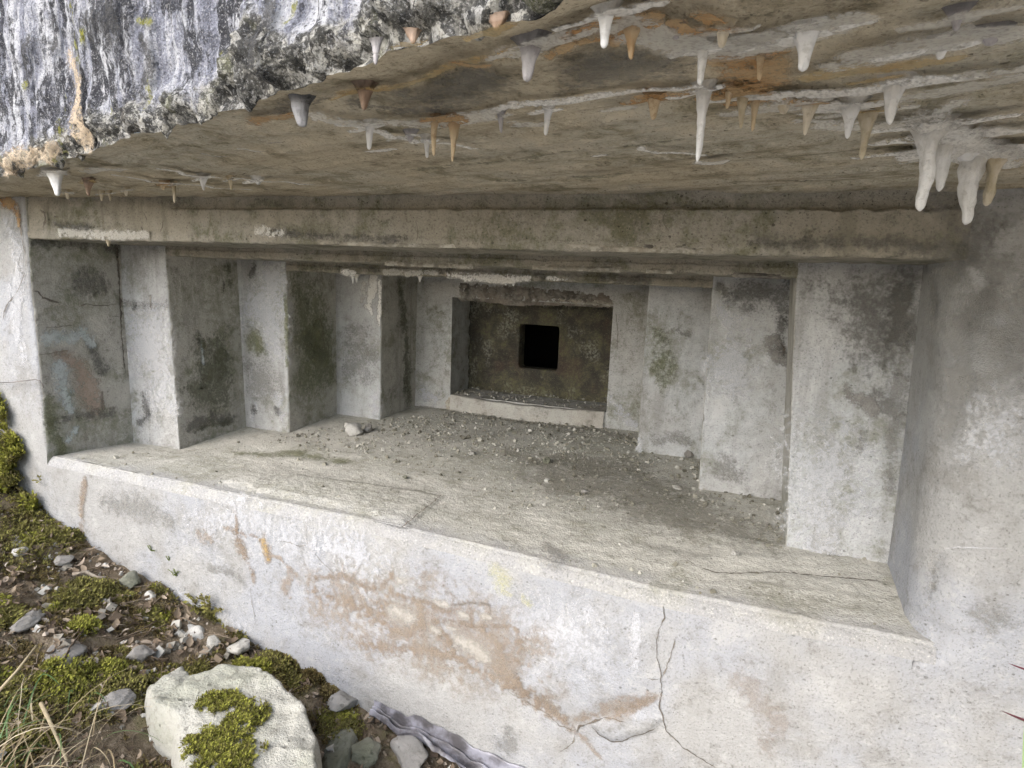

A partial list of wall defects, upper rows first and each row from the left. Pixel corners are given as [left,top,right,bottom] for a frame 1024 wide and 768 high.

rust [543,20,600,60]
rust [635,11,731,35]
water stain [820,26,1024,72]
water stain [308,12,878,152]
rust [706,51,968,101]
water stain [637,146,731,165]
water stain [187,413,236,432]
crack [682,555,877,581]
water stain [198,498,653,757]
crack [508,607,713,766]